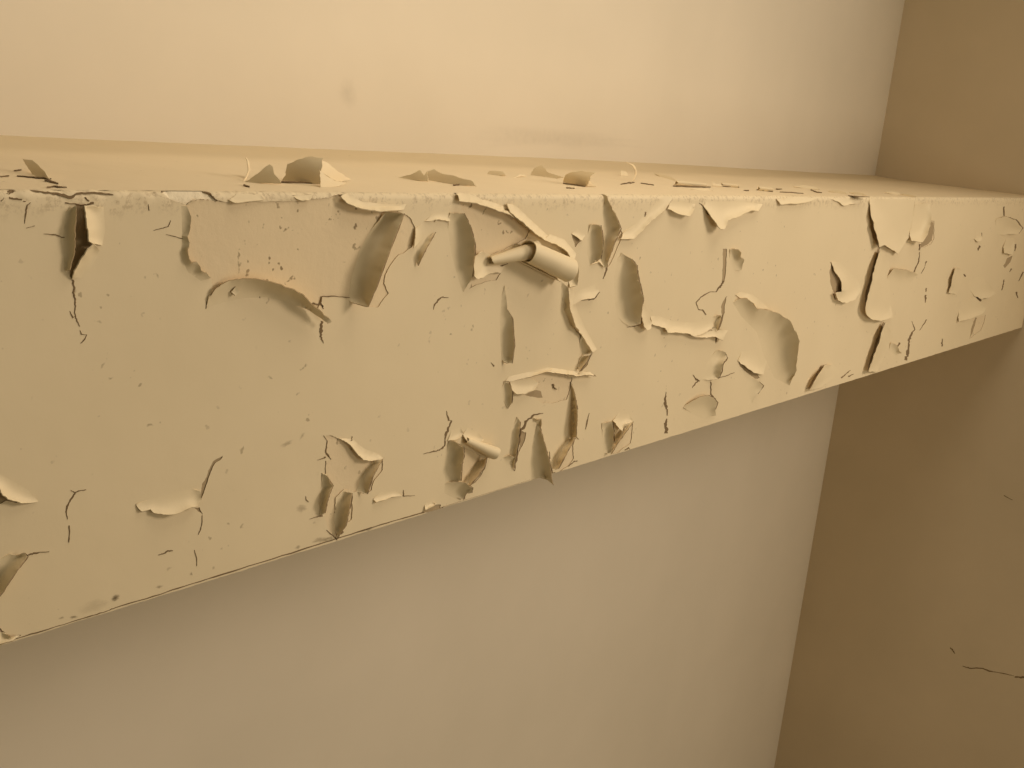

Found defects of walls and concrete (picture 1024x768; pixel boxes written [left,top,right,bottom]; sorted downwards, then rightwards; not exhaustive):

peeling [63,205,105,343]
peeling [161,158,800,485]
peeling [776,185,934,372]
peeling [948,268,997,338]
peeling [808,364,853,390]
peeling [0,475,38,504]
peeling [136,457,222,535]
peeling [311,435,415,540]
peeling [422,441,488,512]
peeling [0,551,49,596]
crack [16,481,525,639]
peeling [0,628,21,645]